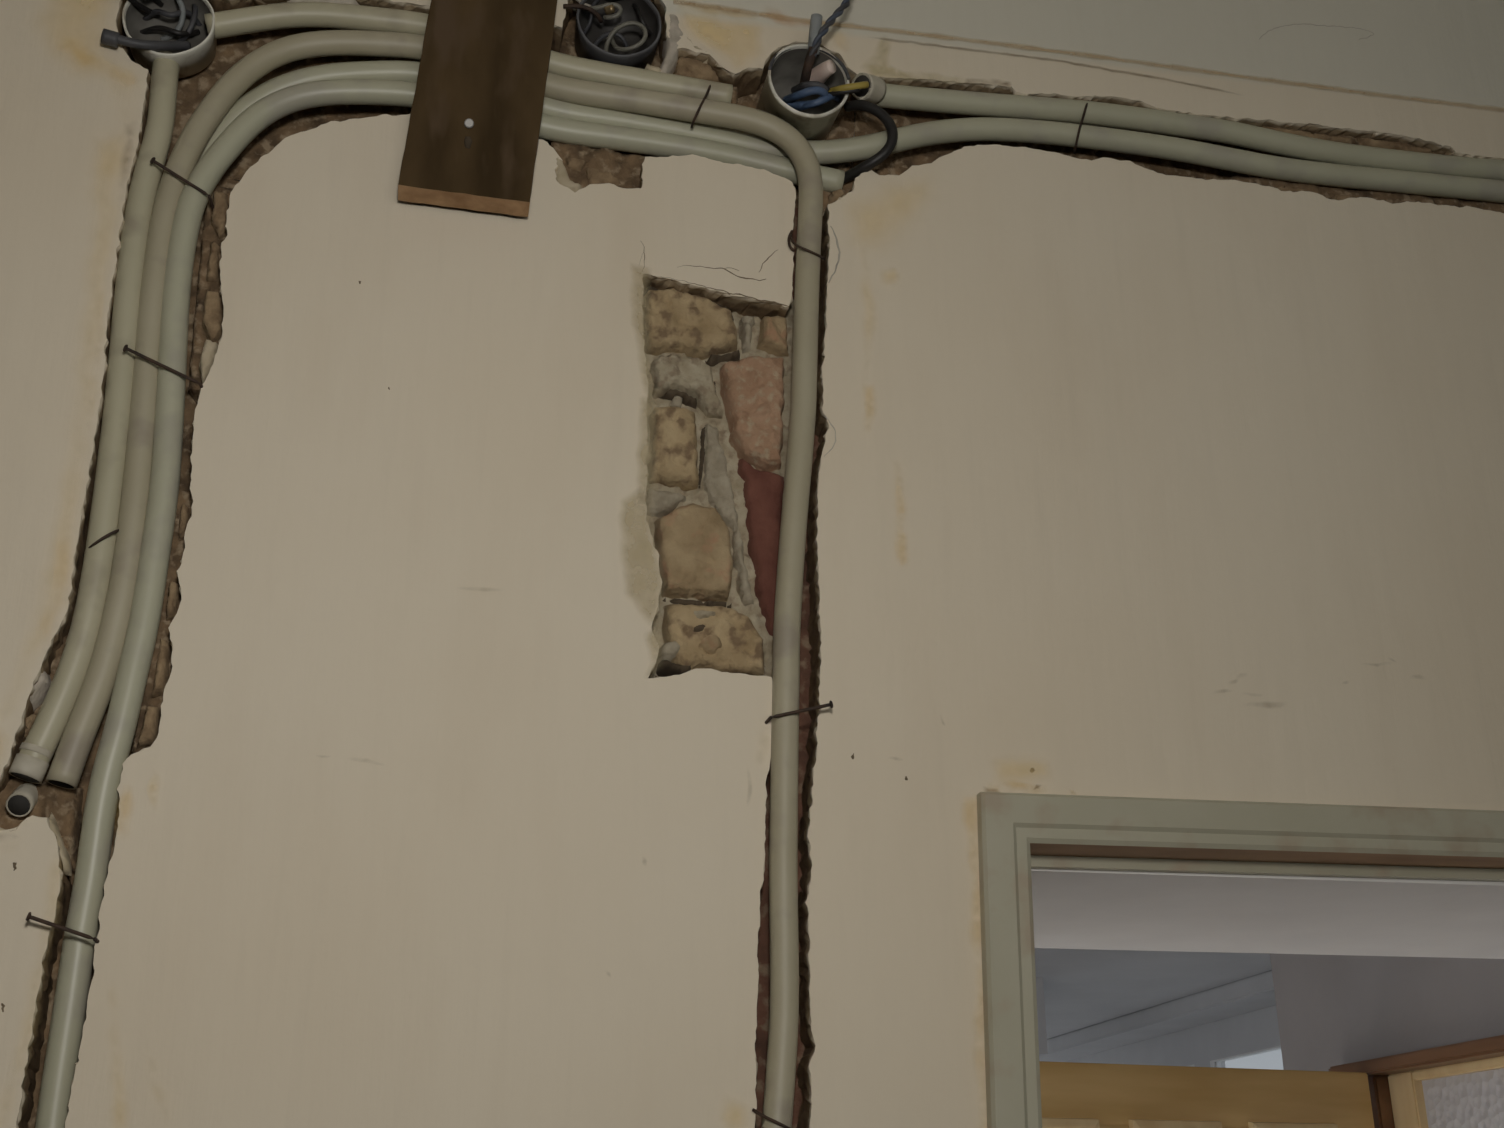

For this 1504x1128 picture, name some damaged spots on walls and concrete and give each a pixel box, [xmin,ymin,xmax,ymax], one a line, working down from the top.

spalling [550,141,645,192]
spalling [1263,126,1444,155]
spalling [1228,176,1504,213]
spalling [188,186,233,404]
crack [828,226,841,283]
spalling [626,286,794,678]
spalling [132,491,192,754]
spalling [23,634,68,742]
spalling [0,759,84,876]